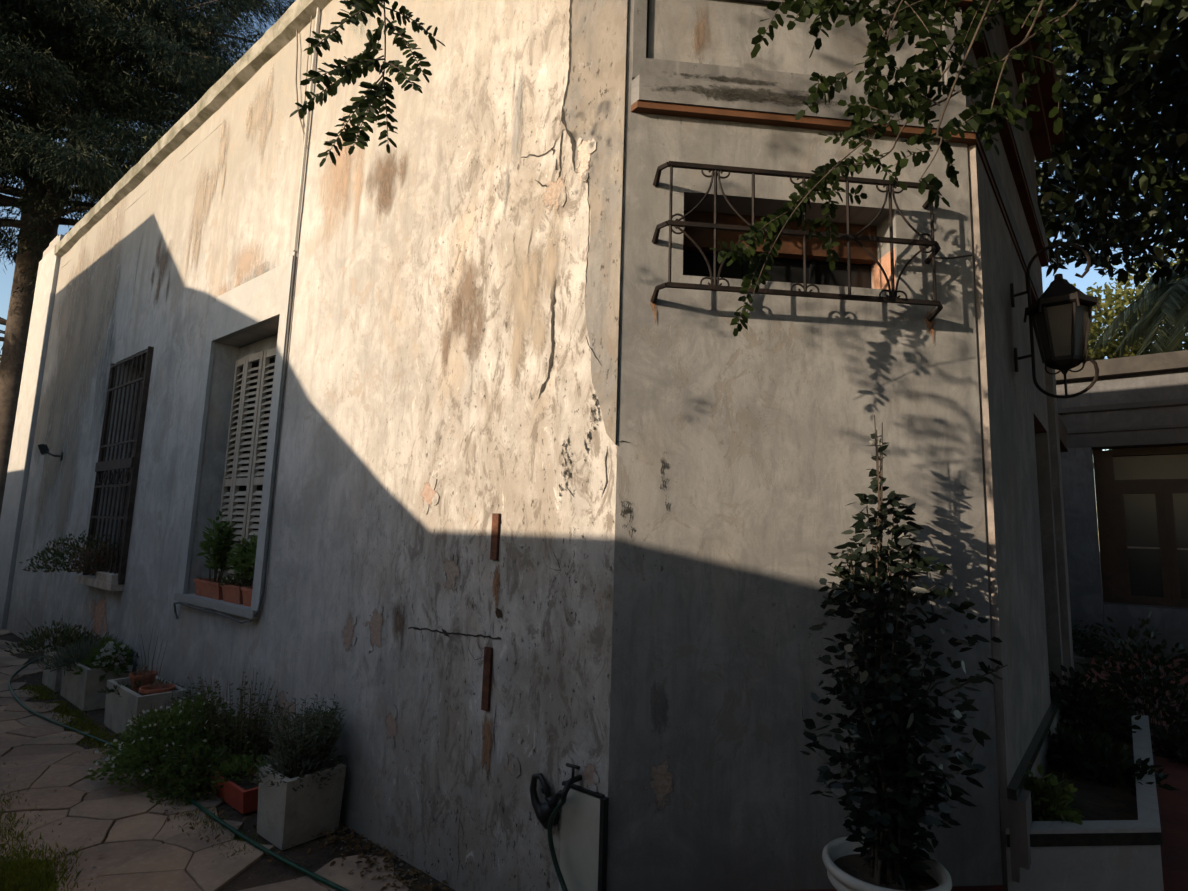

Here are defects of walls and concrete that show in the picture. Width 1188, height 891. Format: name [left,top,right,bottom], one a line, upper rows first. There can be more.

water stain [186,121,228,266]
crack [521,0,590,288]
water stain [658,73,837,106]
water stain [151,239,169,300]
crack [538,277,556,399]
corrosion [493,565,502,618]